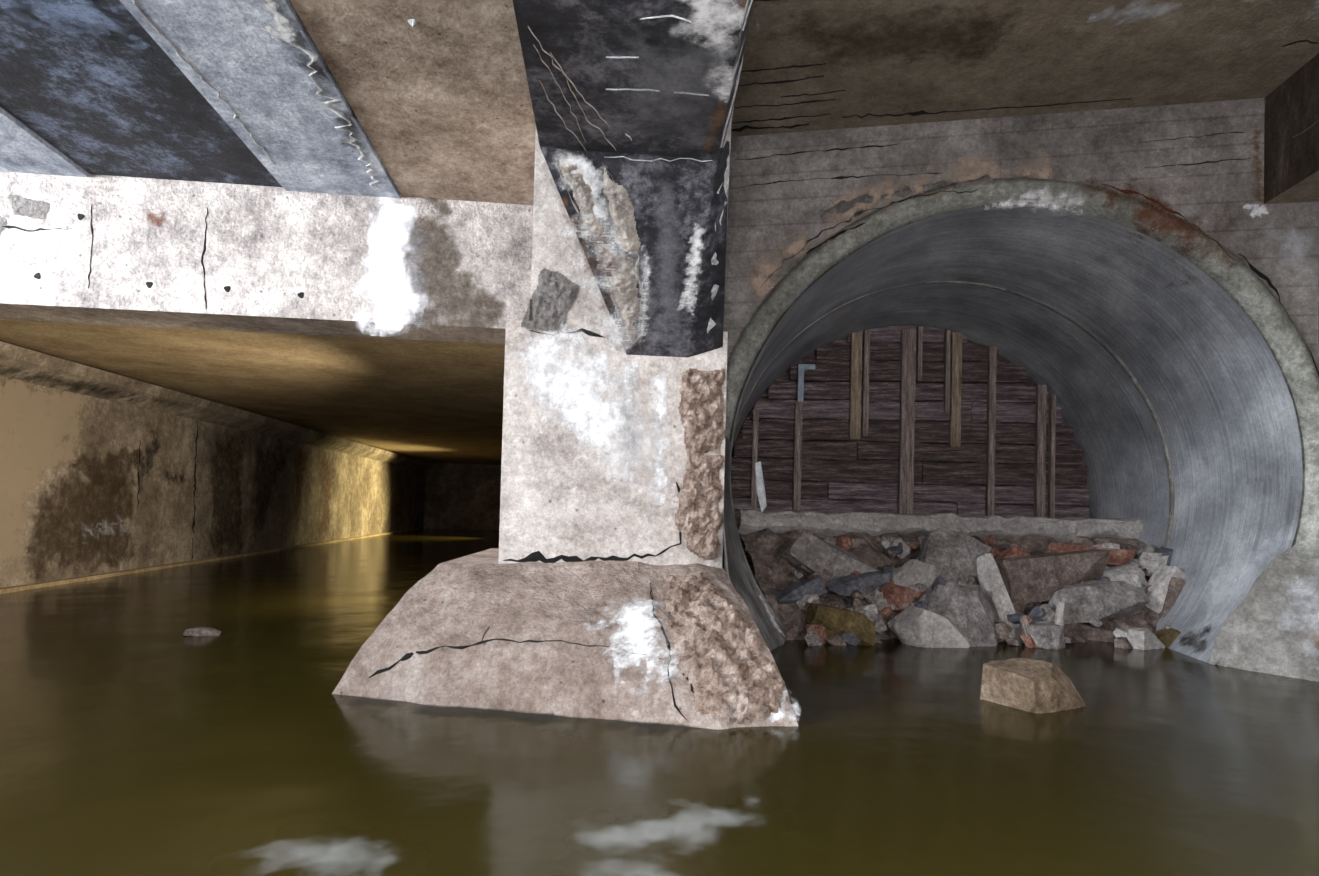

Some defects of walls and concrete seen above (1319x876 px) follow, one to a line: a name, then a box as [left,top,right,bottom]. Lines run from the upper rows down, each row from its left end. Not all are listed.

leakage [35,0,115,26]
peeling [528,26,616,151]
leakage [799,19,994,62]
crack [1282,39,1318,47]
leakage [262,0,501,339]
spalling [521,268,580,333]
peeling [555,159,644,349]
leakage [522,0,753,504]
corrosion [1092,184,1236,262]
leakage [27,430,160,578]
crack [369,482,694,720]
leakage [600,600,675,676]